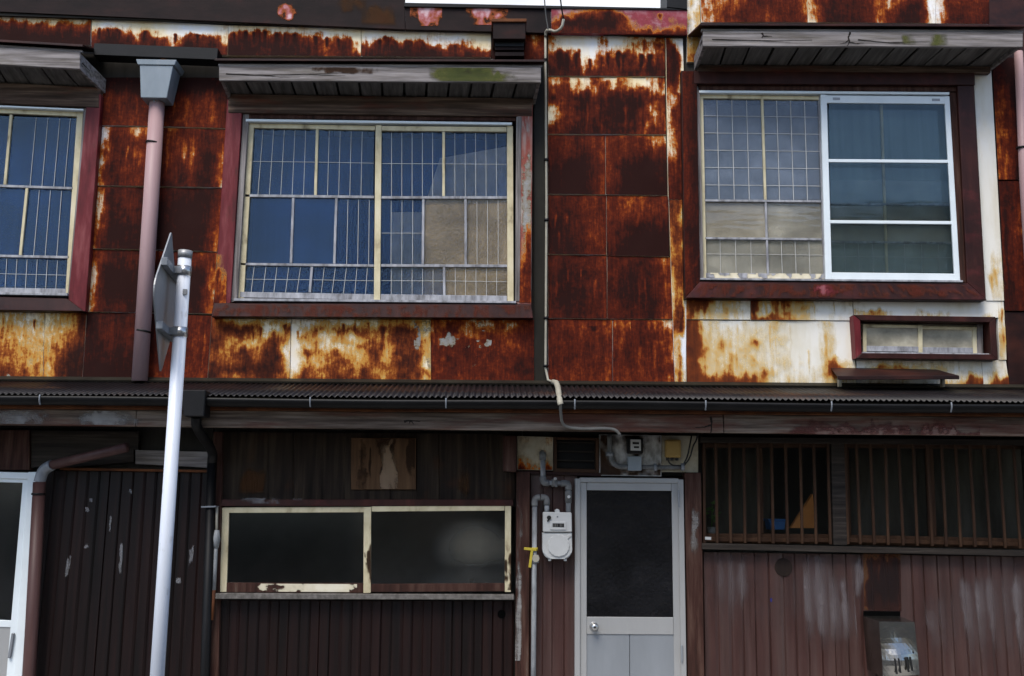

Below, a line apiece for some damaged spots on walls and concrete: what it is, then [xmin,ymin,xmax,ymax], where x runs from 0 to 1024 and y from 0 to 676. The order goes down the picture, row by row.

corrosion [0,0,495,59]
peeling [277,3,297,21]
corrosion [524,0,989,383]
corrosion [0,77,149,377]
corrosion [154,77,534,380]
corrosion [148,305,172,377]
peeling [414,320,458,370]
corrosion [873,362,1009,389]
peeling [258,584,357,592]